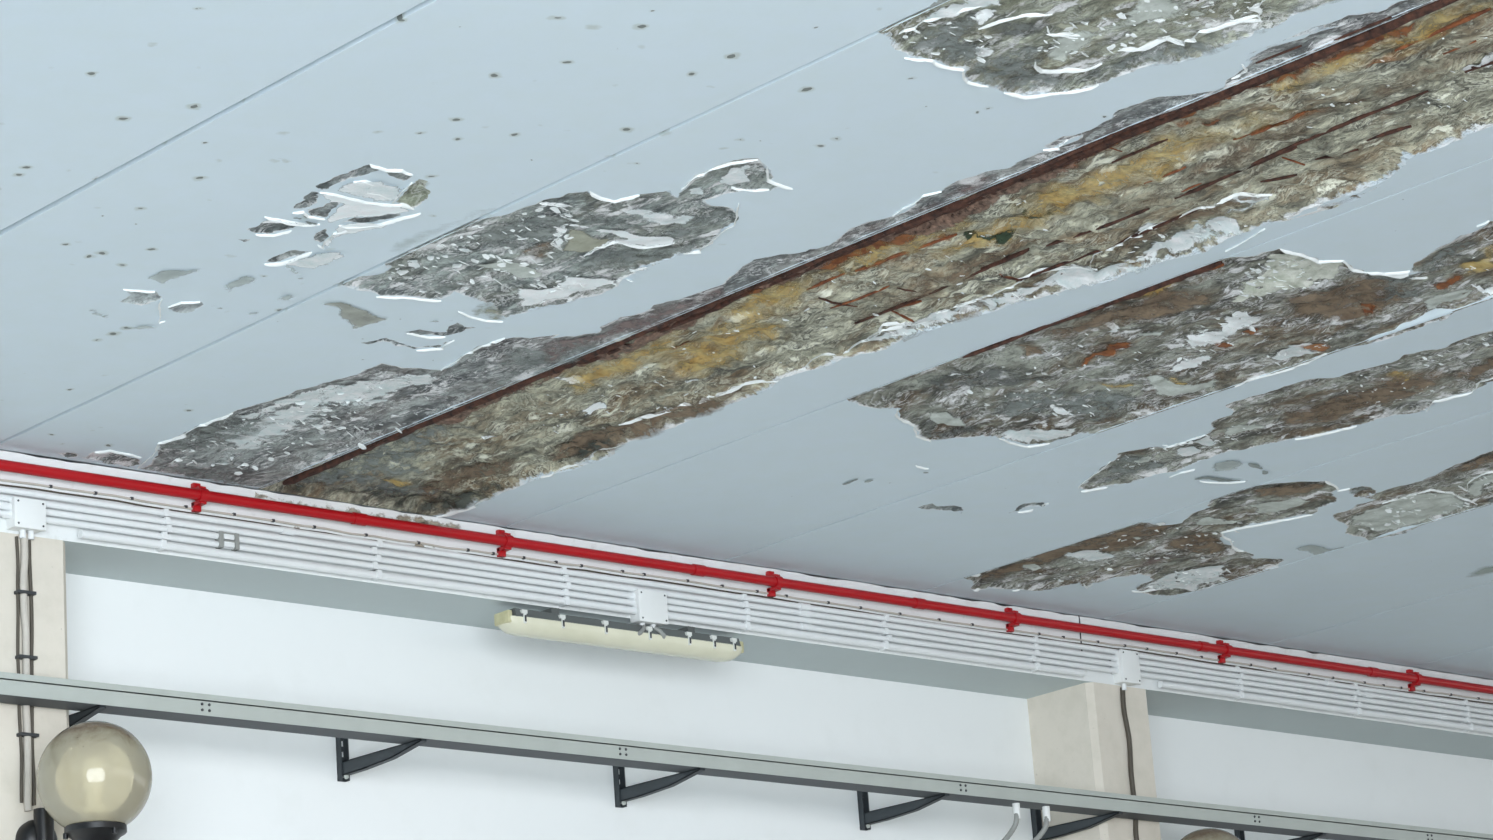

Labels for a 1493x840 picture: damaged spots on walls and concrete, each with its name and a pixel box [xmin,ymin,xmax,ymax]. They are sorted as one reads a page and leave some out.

spalling [54,0,1493,518]
peeling [964,451,1493,596]